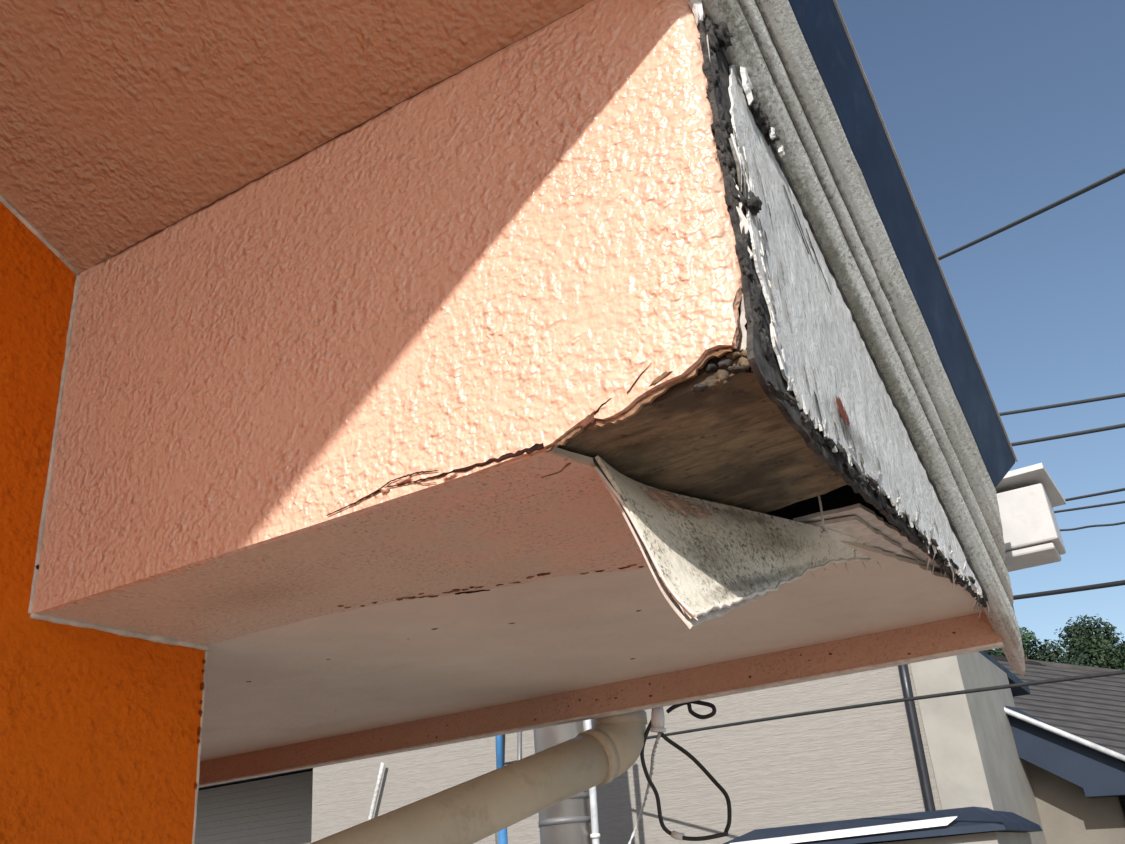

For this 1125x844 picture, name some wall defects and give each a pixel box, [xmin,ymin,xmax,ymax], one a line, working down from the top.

spalling [688,0,703,25]
peeling [733,128,883,488]
crack [594,363,651,414]
peeling [648,371,673,387]
peeling [577,411,596,429]
corrosion [836,396,850,427]
crack [326,443,571,516]
peeling [396,572,551,601]